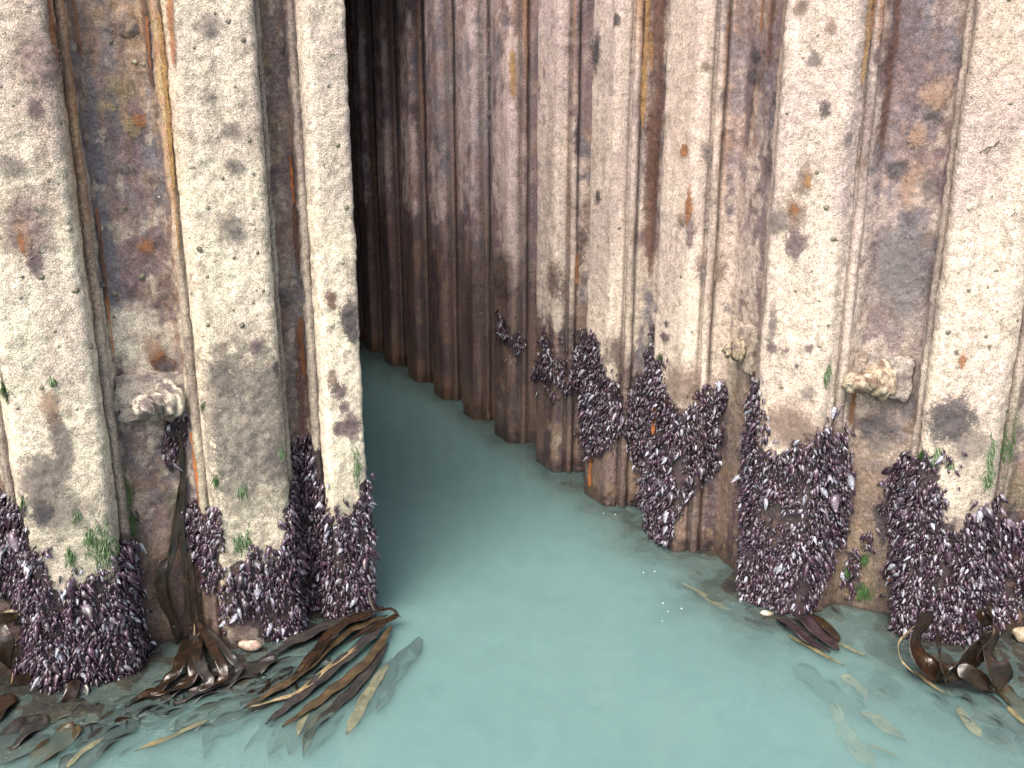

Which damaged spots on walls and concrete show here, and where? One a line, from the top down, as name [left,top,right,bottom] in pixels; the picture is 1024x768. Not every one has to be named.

corrosion [861,0,876,91]
corrosion [880,0,902,154]
corrosion [140,0,181,267]
corrosion [289,156,299,268]
corrosion [640,0,667,277]
corrosion [677,178,697,248]
water stain [884,158,938,200]
water stain [867,229,934,318]
water stain [15,418,94,538]
corrosion [189,431,201,515]
corrosion [294,317,306,432]
water stain [924,392,996,468]